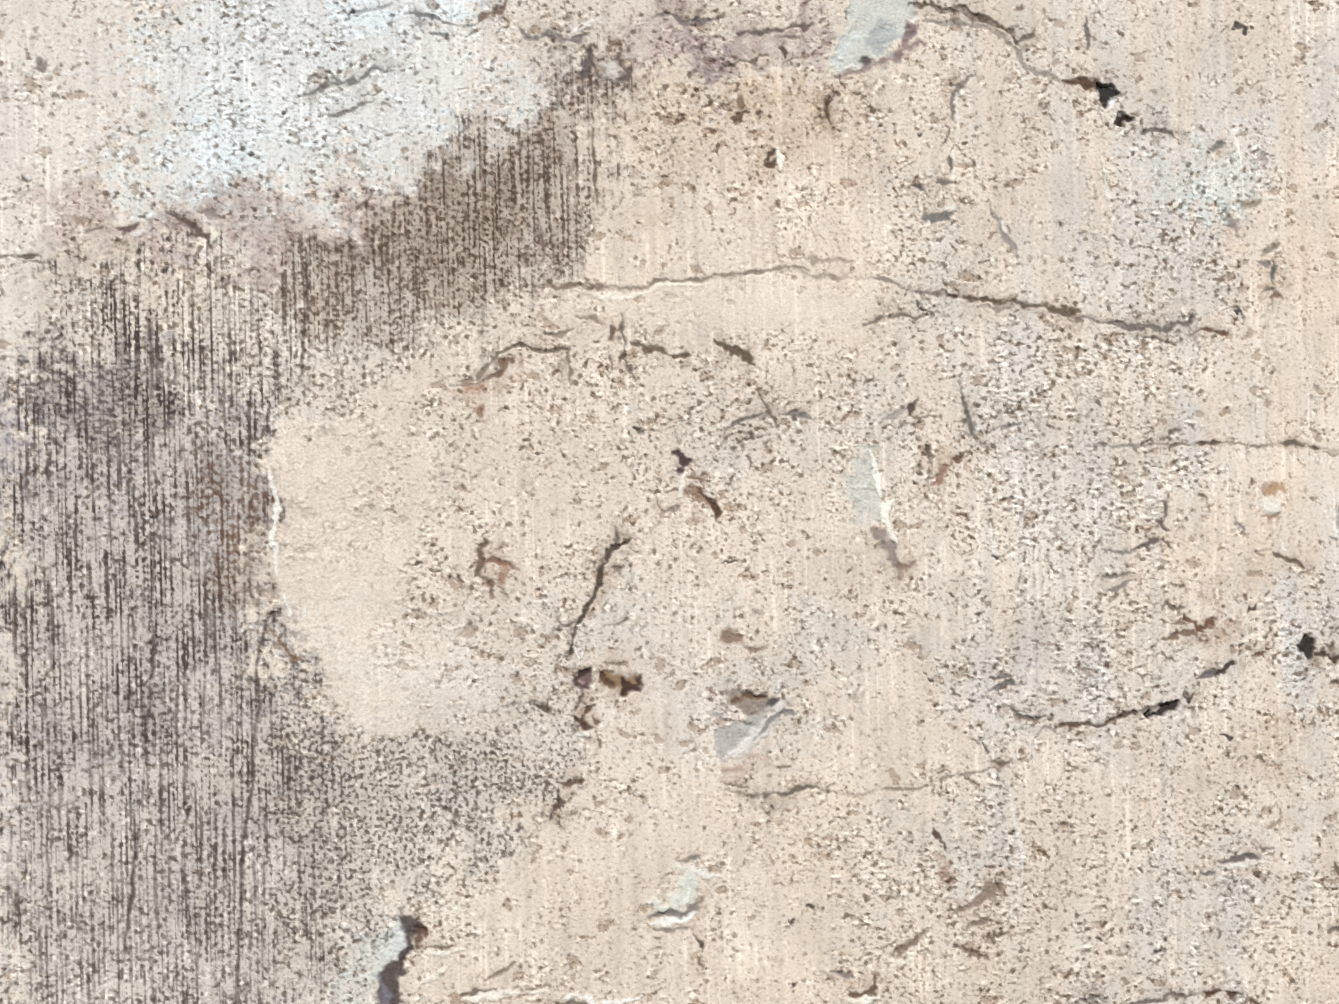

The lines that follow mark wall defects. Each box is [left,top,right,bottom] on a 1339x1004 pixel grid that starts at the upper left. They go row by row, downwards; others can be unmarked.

spalling [828,0,947,90]
crack [905,0,1190,183]
crack [449,253,1234,459]
damp [0,0,843,1004]
crack [528,512,640,719]
crack [716,416,1339,817]
spalling [322,902,437,1004]
crack [1068,976,1316,1004]
crack [1311,856,1339,945]